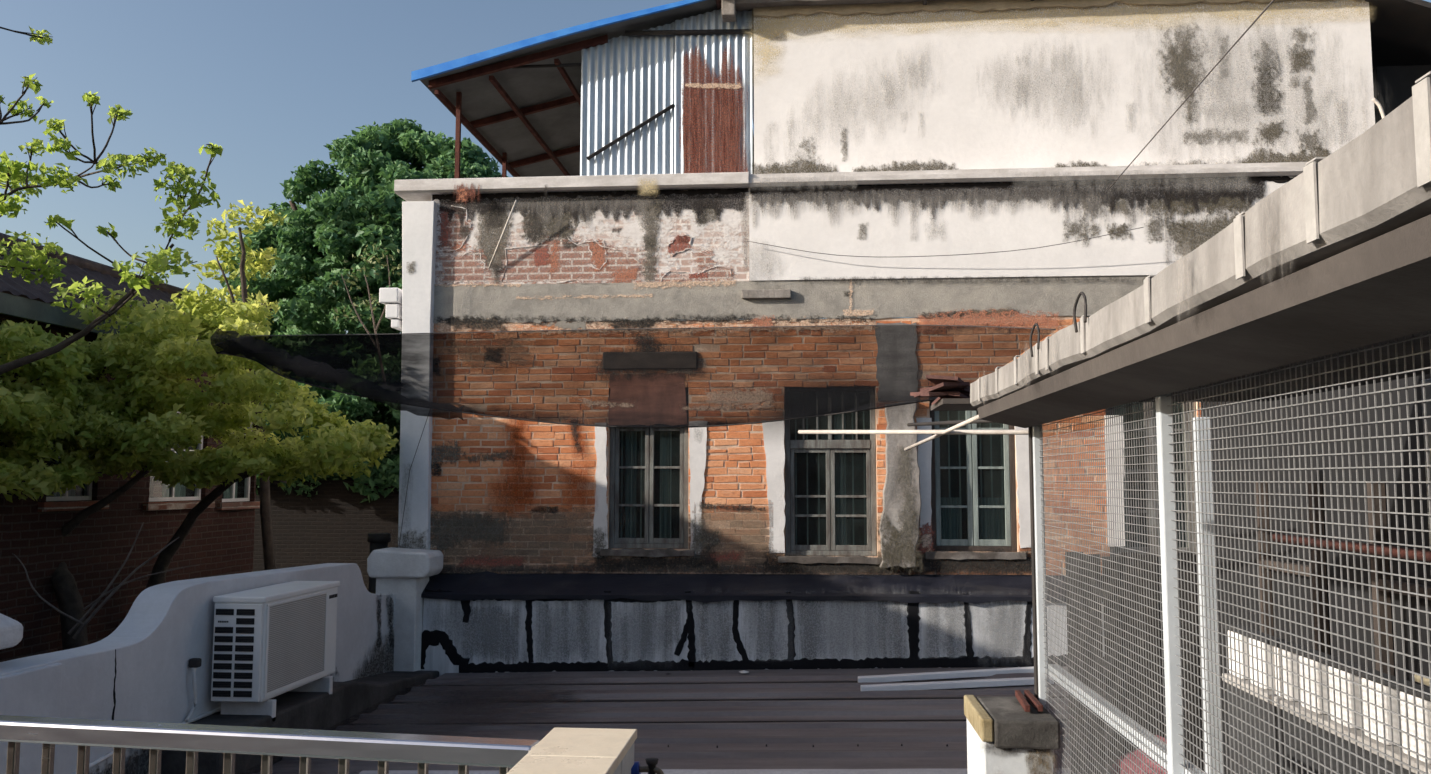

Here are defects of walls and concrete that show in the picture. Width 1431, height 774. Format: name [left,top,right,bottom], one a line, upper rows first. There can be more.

corrosion [680,45,748,173]
damp [432,0,1363,299]
flaking render [433,203,875,333]
damp [763,448,1032,575]
crack [110,649,118,720]
crack [421,589,1068,673]